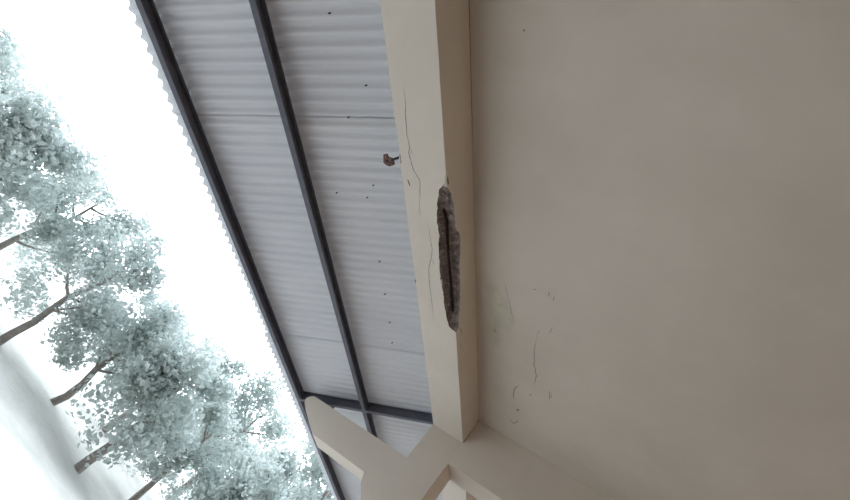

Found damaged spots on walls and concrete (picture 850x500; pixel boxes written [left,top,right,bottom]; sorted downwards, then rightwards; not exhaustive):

spalling [437,173,461,332]